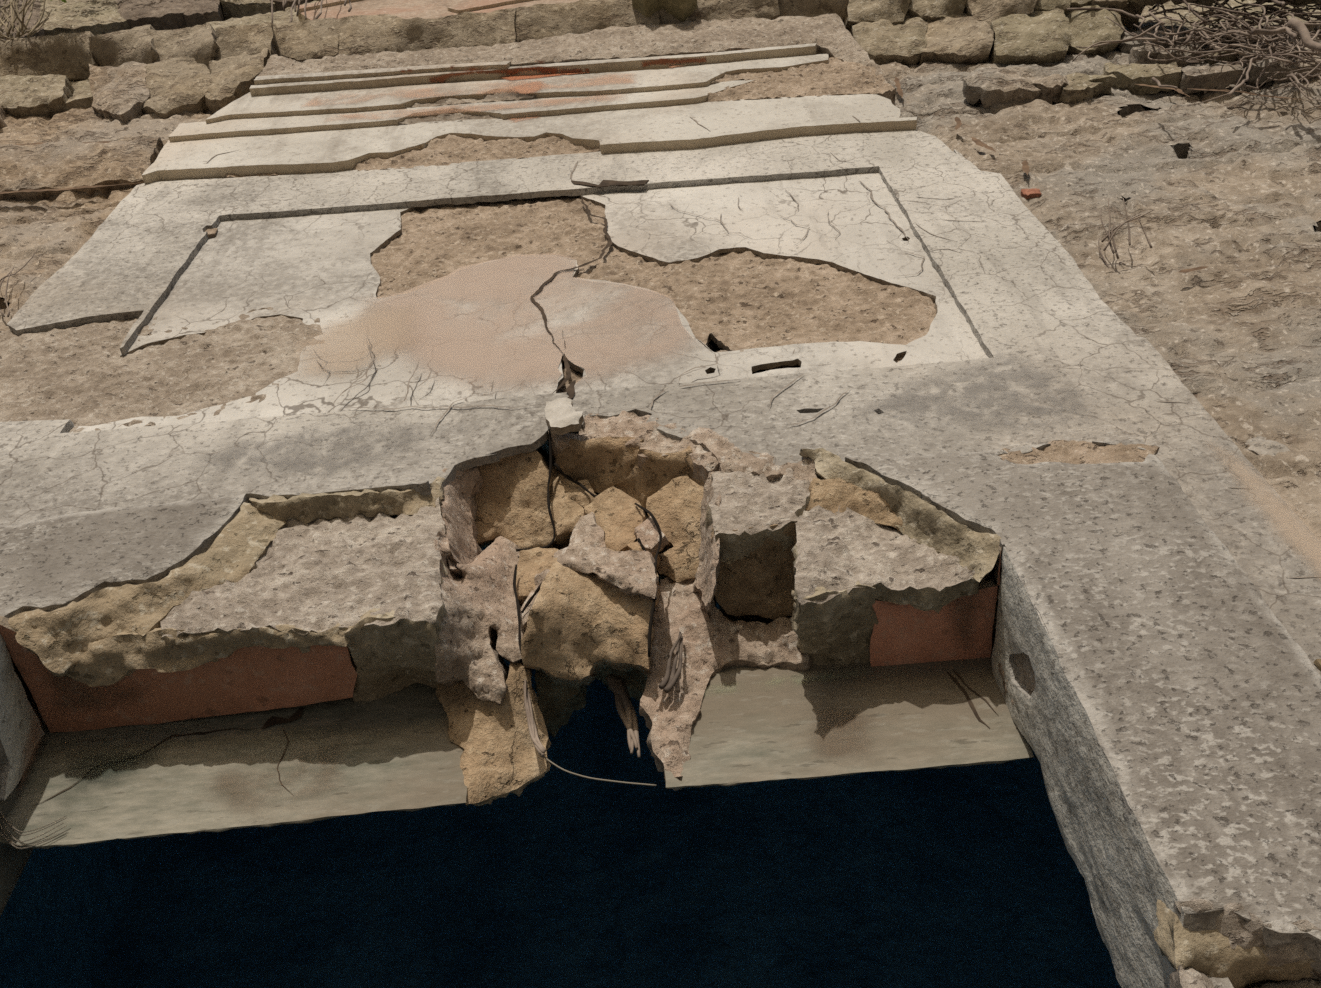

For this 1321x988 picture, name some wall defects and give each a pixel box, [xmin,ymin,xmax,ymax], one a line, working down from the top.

flaking render [370,196,936,360]
crack [777,189,840,245]
crack [831,153,985,276]
crack [314,161,746,657]
flaking render [998,440,1160,464]
spalling [8,411,1001,806]
flaking render [1153,897,1321,988]